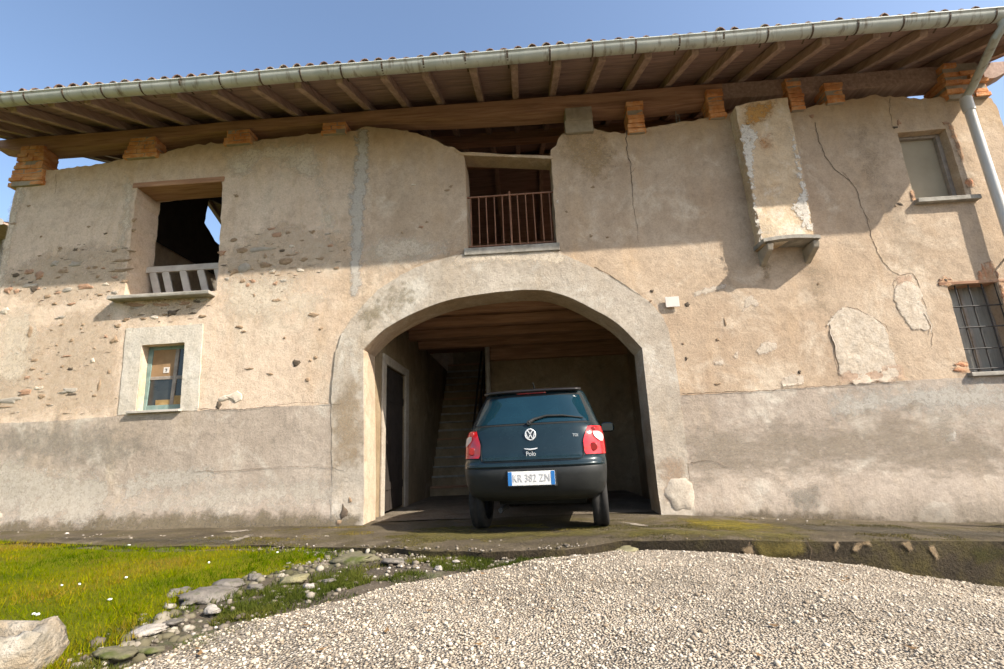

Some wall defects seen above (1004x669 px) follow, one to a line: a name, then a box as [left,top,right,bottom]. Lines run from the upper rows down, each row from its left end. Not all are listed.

flaking render [0,187,211,414]
flaking render [217,227,345,330]
crack [625,130,638,238]
peeling [739,125,763,242]
peeling [789,127,814,231]
flaking render [827,307,901,385]
crack [815,123,932,343]
flaking render [894,276,933,333]
spalling [953,361,970,372]
spalling [977,261,1004,303]
damp [734,490,1004,537]